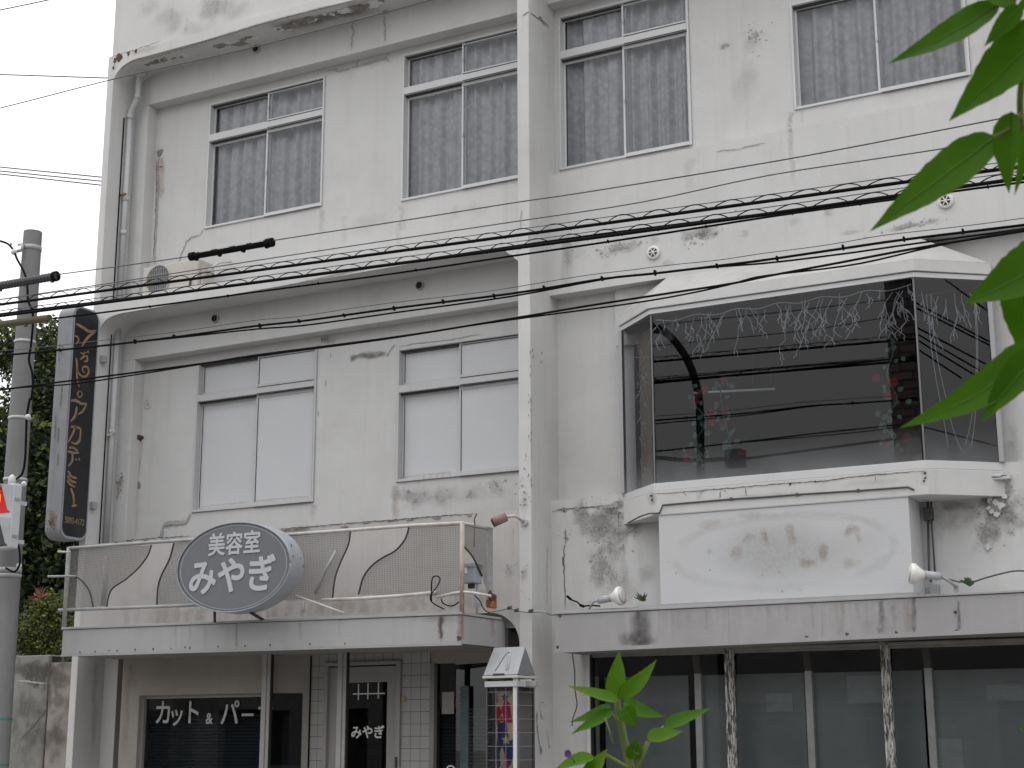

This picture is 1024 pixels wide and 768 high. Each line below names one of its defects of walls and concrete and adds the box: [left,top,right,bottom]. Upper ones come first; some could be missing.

spalling [273,0,386,31]
crack [328,17,390,72]
crack [561,508,569,607]
damp [558,492,646,593]
spalling [971,474,1024,552]